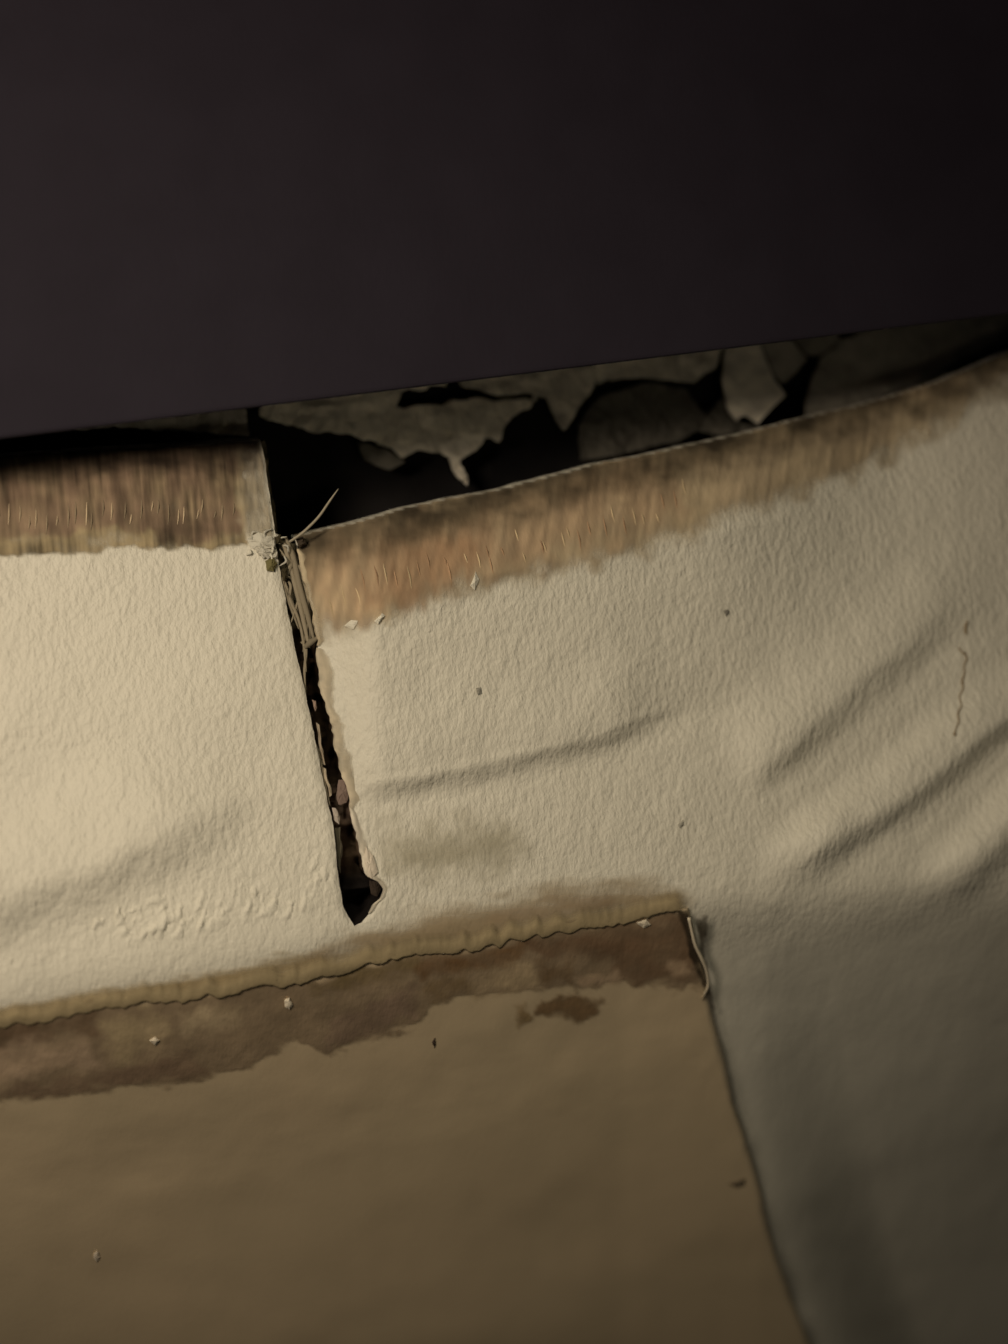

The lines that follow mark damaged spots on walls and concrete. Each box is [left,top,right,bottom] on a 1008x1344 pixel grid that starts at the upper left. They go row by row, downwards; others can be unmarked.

spalling [0,314,1008,556]
crack [246,440,386,925]
water stain [153,952,334,987]
water stain [351,894,680,948]